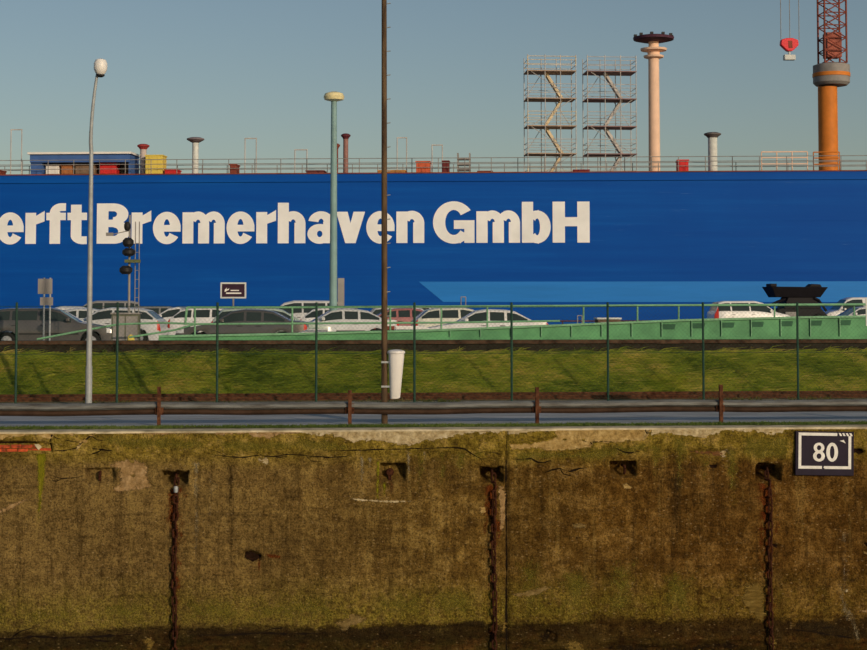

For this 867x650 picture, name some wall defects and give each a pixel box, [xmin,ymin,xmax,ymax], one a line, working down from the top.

flaking render [0,433,94,452]
spalling [110,460,151,492]
crack [212,447,583,476]
rust [166,485,187,565]
leakage [316,621,485,636]